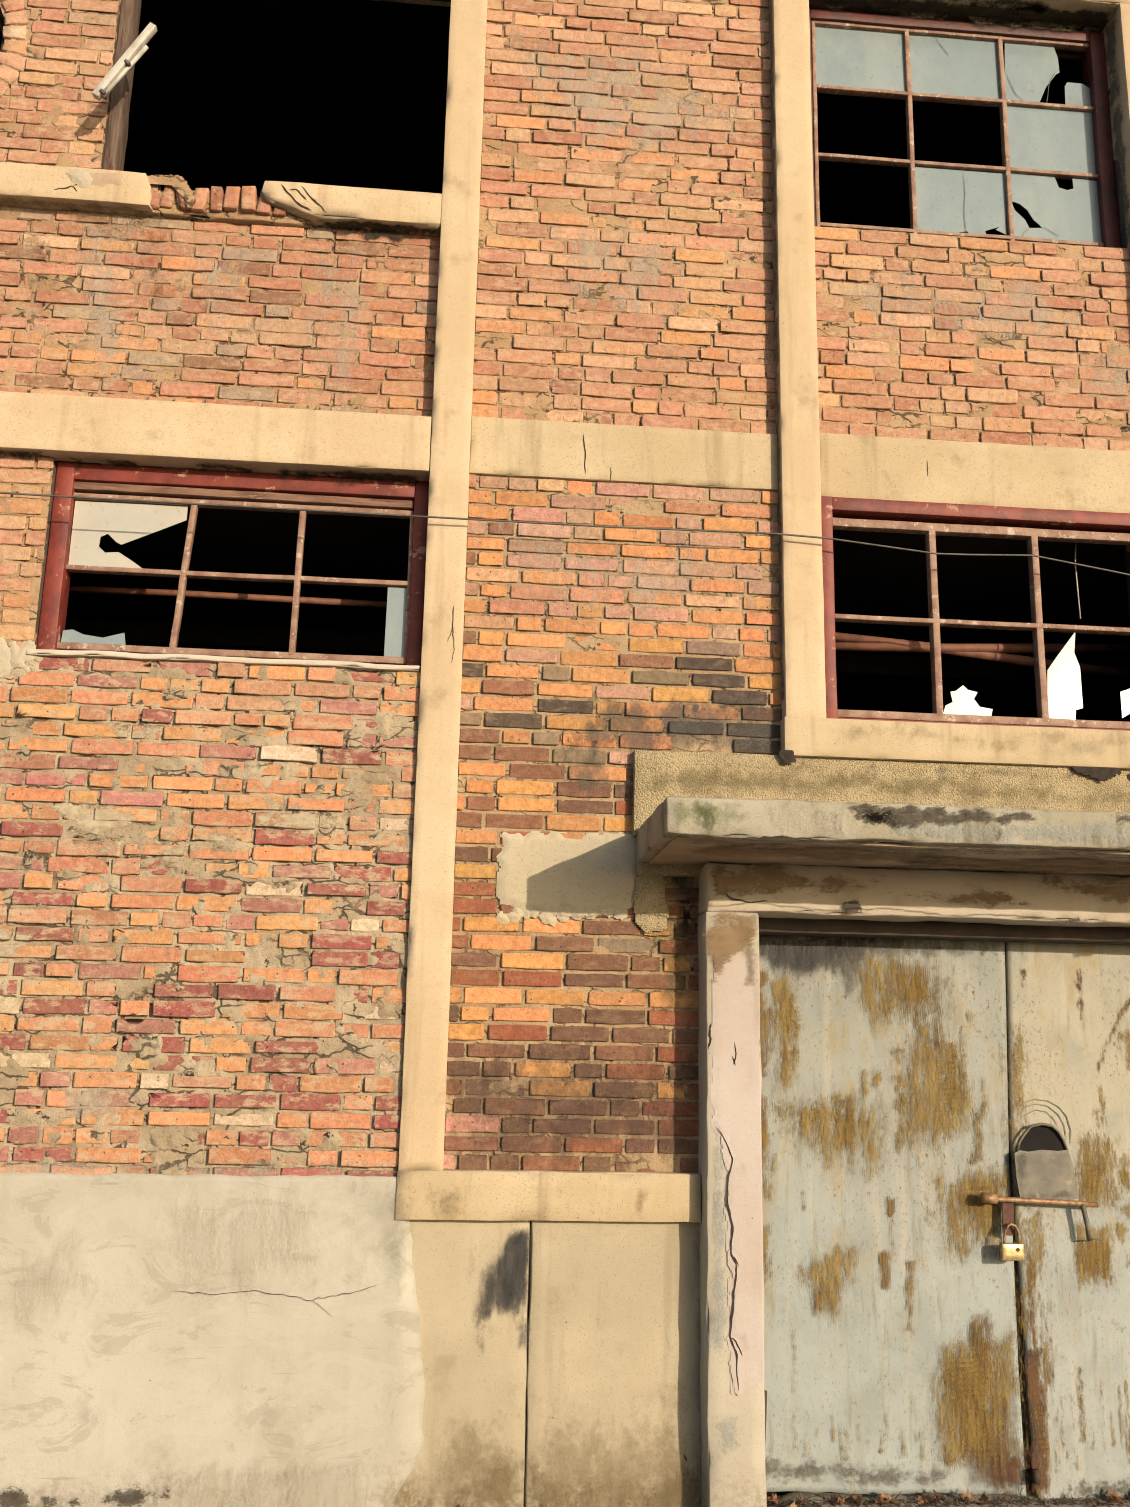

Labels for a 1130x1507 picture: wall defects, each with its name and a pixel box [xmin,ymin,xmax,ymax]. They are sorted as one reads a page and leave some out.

damp [818,0,1130,248]
peeling [147,174,287,218]
peeling [9,640,36,673]
damp [693,807,1130,874]
peeling [496,875,669,933]
peeling [712,864,877,915]
peeling [933,890,1027,907]
peeling [1044,876,1130,903]
rust [760,946,1130,1499]
damp [504,1233,530,1301]
crack [716,1127,743,1391]